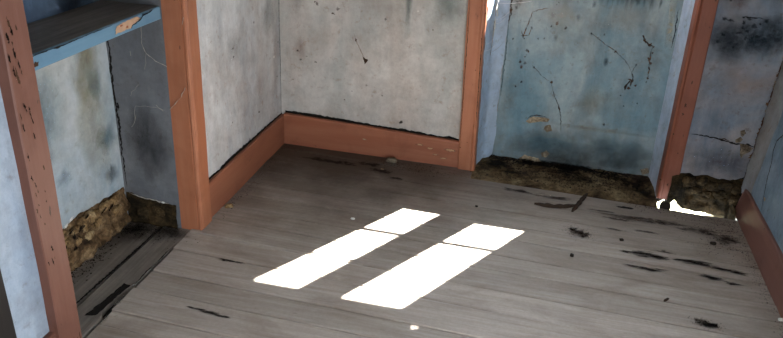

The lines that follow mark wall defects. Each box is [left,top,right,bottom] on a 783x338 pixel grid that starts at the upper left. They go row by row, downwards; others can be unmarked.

peeling [116,17,140,34]
crack [500,0,562,124]
crack [591,12,678,90]
damp [713,17,781,54]
crack [694,134,753,147]
flaking render [660,173,744,219]
flaking render [63,187,178,272]